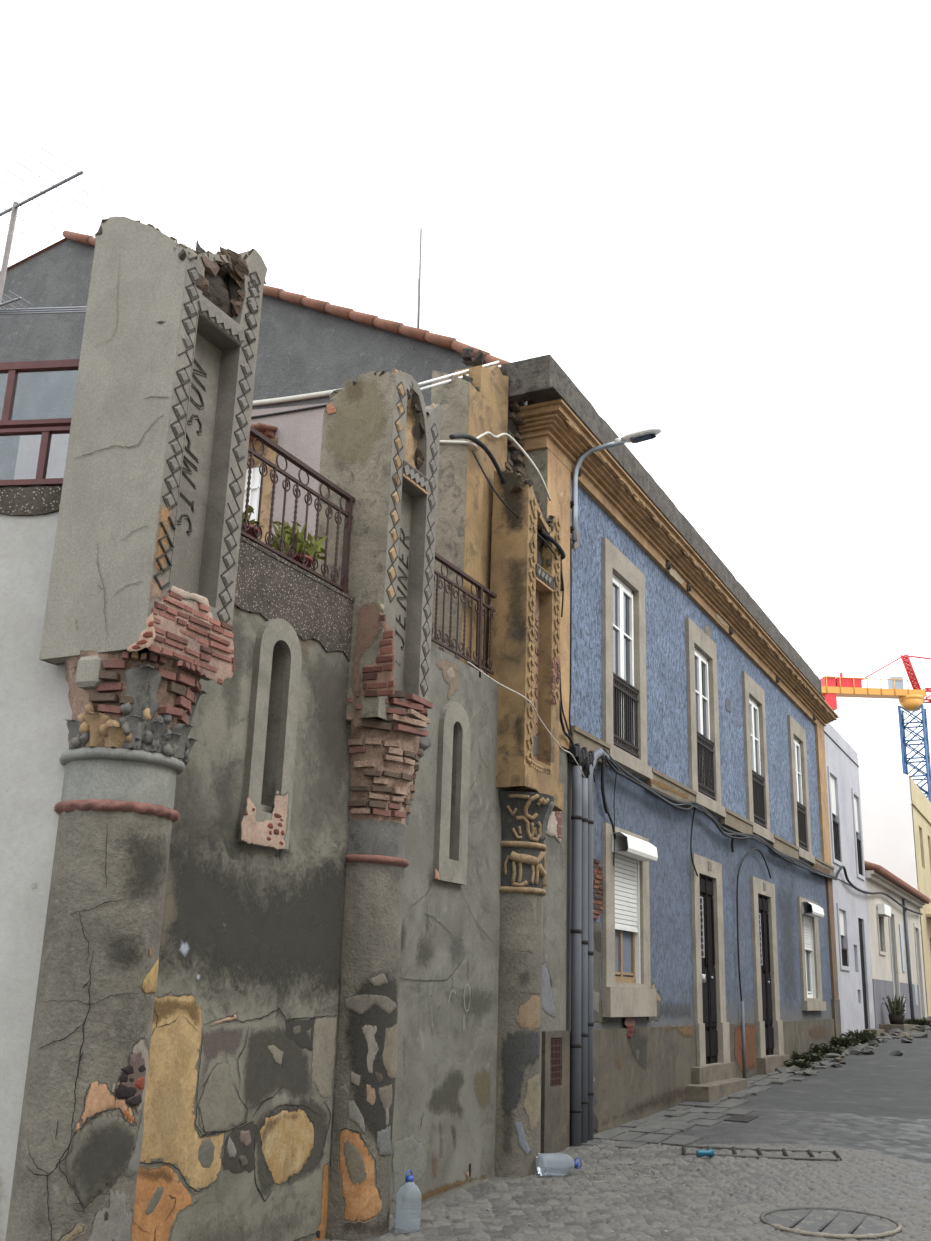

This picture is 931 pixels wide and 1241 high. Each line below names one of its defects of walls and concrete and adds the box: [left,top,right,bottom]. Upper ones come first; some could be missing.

flaking render [127,508,236,685]
flaking render [361,603,396,698]
damp [127,764,347,1002]
flaking render [241,790,289,851]
crack [27,824,132,1241]
flaking render [58,948,315,1241]
flaking render [314,973,398,1241]
flaking render [501,962,557,1155]